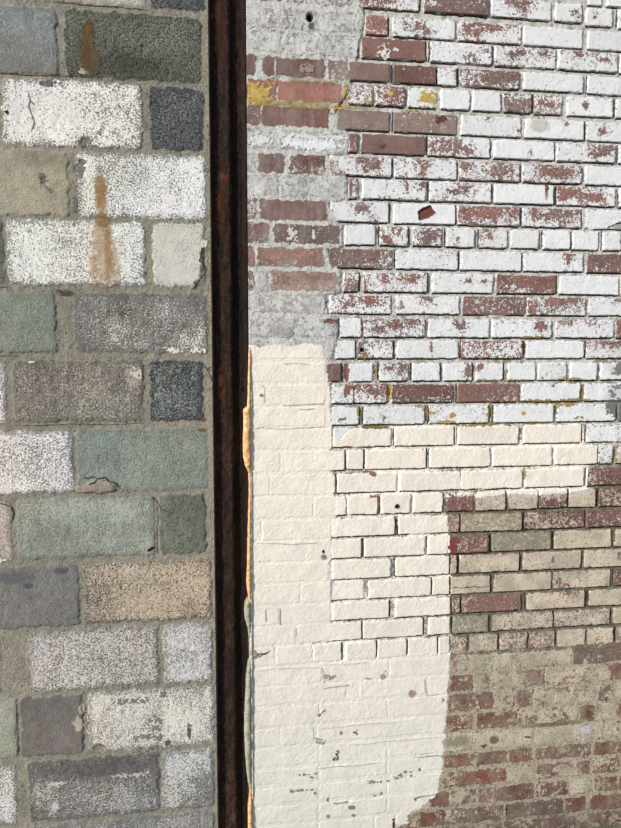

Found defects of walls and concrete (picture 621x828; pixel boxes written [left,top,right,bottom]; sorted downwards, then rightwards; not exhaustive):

corrosion [76,21,99,77]
peeling [357,157,383,173]
peeling [405,137,481,194]
peeling [588,126,614,159]
corrosion [94,169,108,226]
peeling [349,181,376,221]
spalling [418,205,440,246]
peeling [530,167,607,227]
peeling [342,281,380,308]
peeling [372,319,417,333]
peeling [497,275,581,340]
peeling [343,363,590,429]